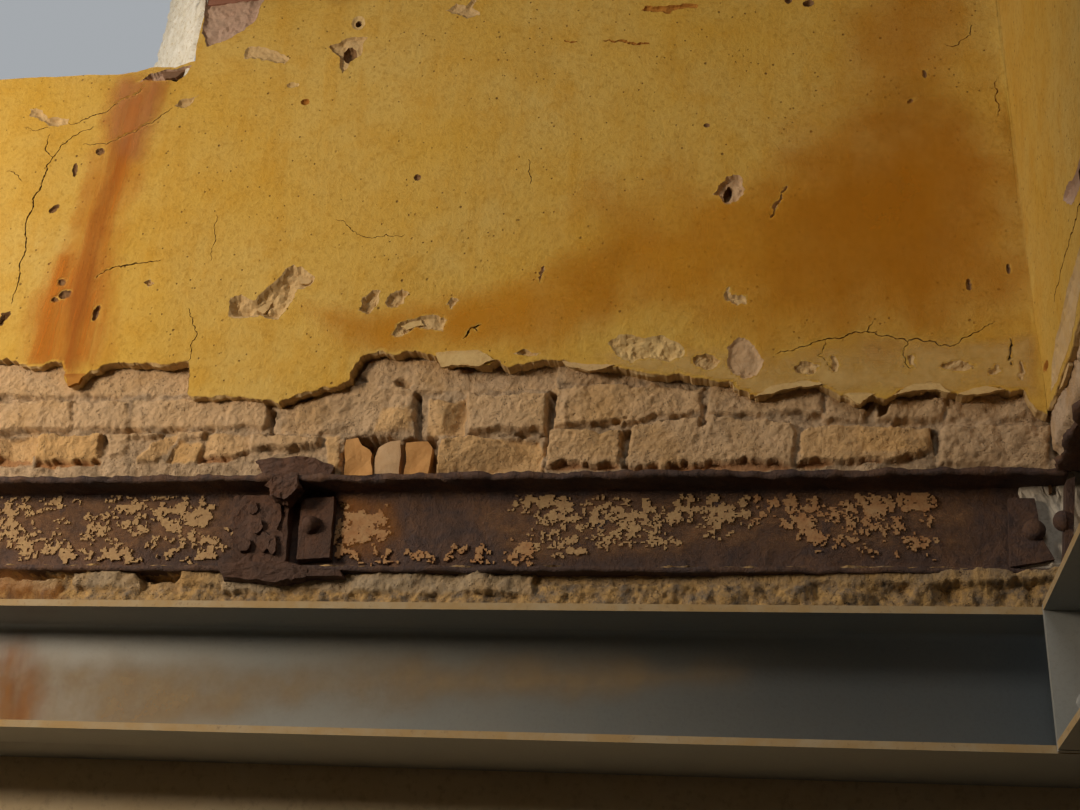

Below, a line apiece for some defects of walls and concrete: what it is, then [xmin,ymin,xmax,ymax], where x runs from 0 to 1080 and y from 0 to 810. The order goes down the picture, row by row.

flaking render [202,0,264,47]
flaking render [329,37,368,72]
crack [0,86,172,324]
spalling [713,174,745,204]
flaking render [1063,159,1080,205]
crack [1054,169,1080,301]
flaking render [0,248,1080,419]
water stain [676,342,1029,392]
crack [777,322,1013,369]